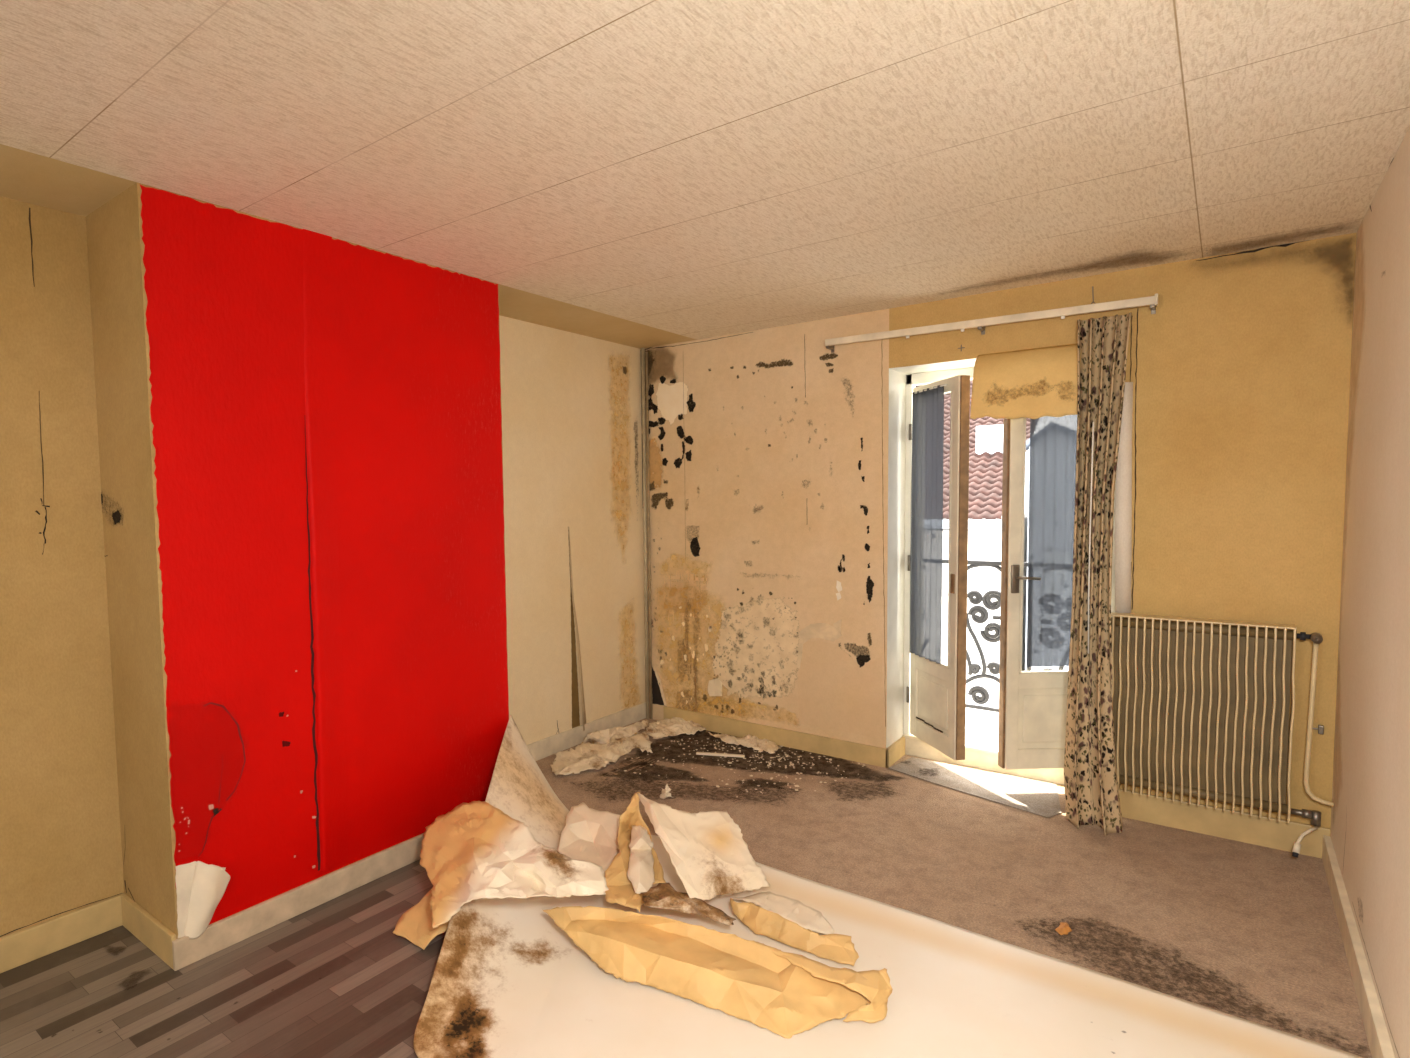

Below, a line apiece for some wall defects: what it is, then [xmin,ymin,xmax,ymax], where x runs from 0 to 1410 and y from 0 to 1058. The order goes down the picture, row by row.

crack [28,208,36,287]
water stain [1082,255,1159,269]
crack [37,391,45,505]
water stain [658,602,778,714]
water stain [839,633,872,668]
water stain [572,730,901,804]